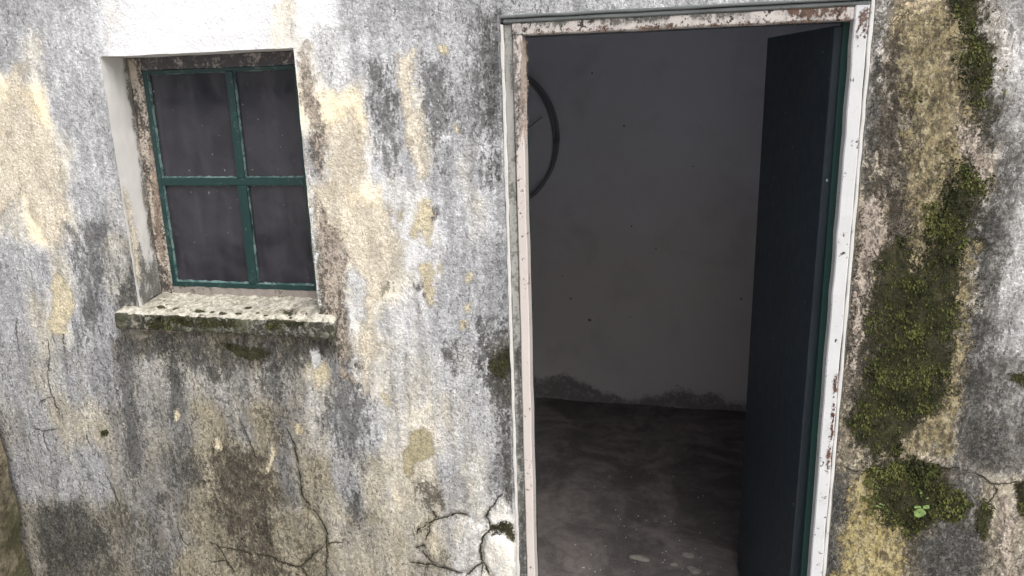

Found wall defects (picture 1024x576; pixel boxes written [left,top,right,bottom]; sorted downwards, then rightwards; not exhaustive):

rust [534,5,872,47]
leakage [419,60,459,160]
leakage [466,0,521,190]
leakage [62,58,368,478]
leakage [827,0,1007,576]
crack [33,330,64,450]
leakage [315,360,379,468]
rust [825,374,838,472]
leakage [28,502,111,576]
leakage [181,431,300,576]
crack [175,421,342,576]
crack [411,491,513,576]